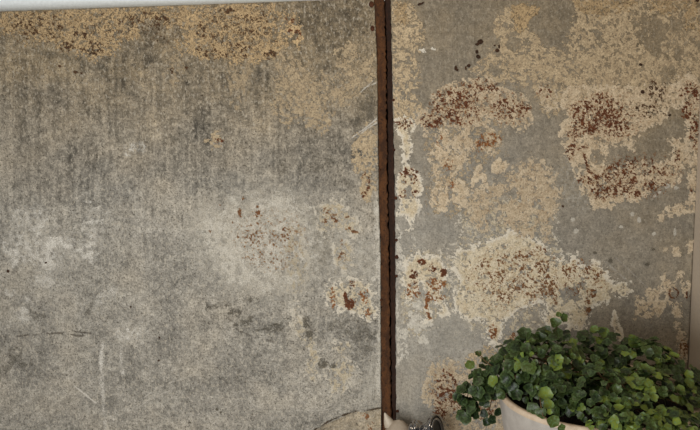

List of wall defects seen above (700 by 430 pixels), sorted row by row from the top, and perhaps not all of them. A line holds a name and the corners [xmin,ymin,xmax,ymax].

peeling [0,2,377,138]
rust [394,77,532,147]
rust [472,133,502,156]
rust [565,80,684,202]
rust [679,80,700,149]
peeling [392,0,700,430]
peeling [313,196,380,323]
rust [329,281,372,316]
rust [404,259,447,320]
rust [457,244,612,317]